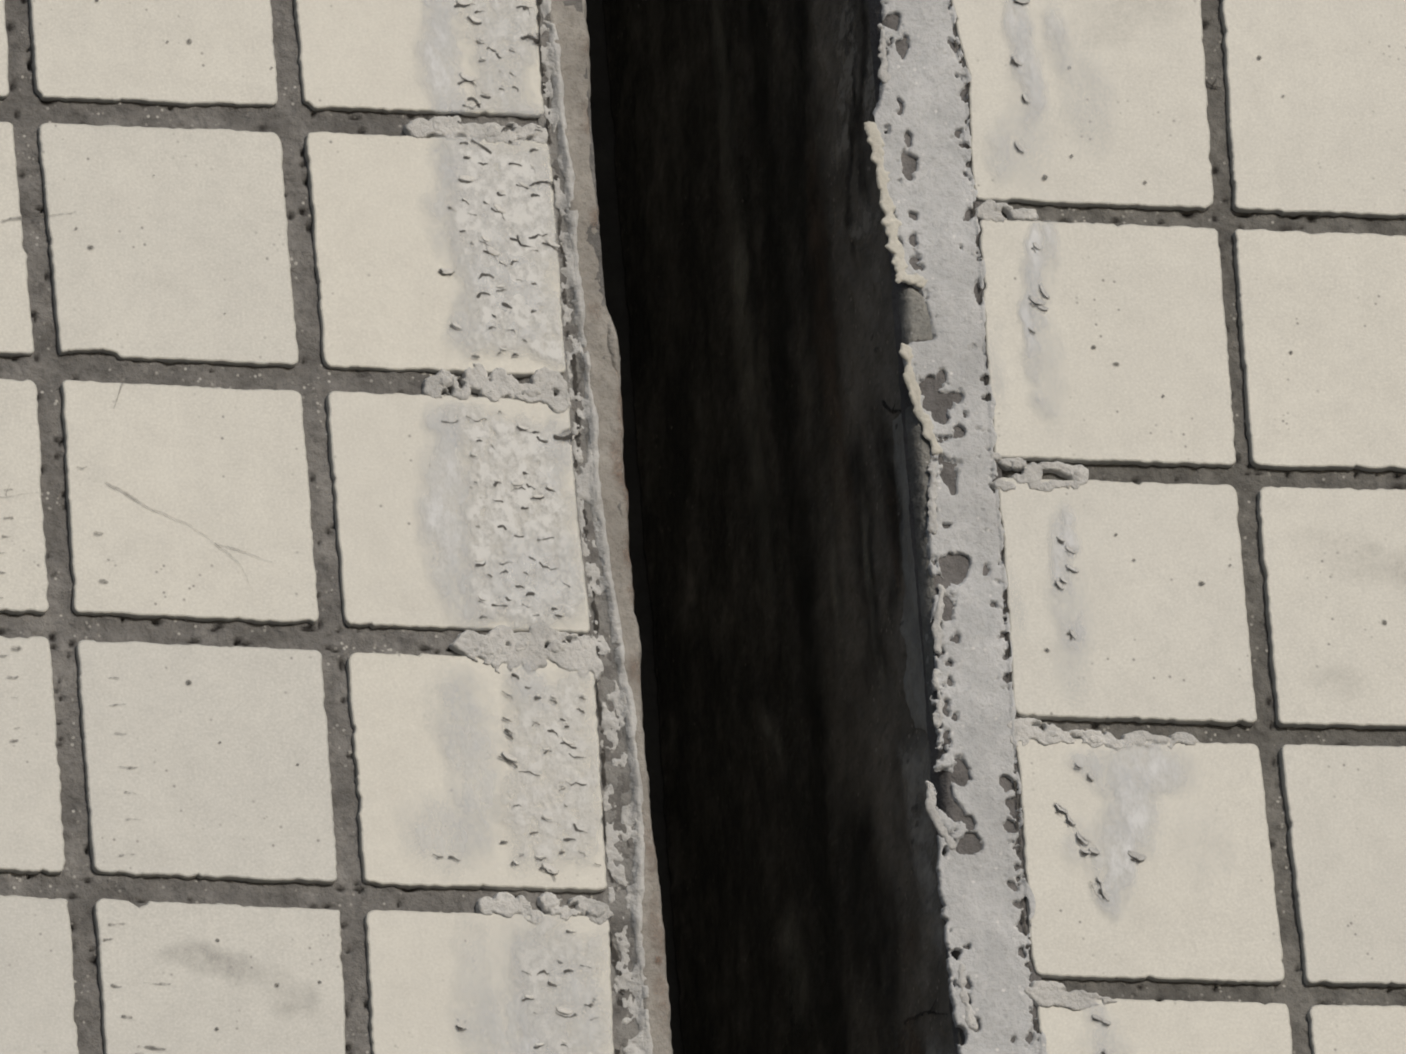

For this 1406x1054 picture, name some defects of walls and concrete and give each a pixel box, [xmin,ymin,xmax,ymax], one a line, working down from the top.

peeling [439,0,653,1054]
crack [521,0,614,882]
crack [610,930,625,1006]
peeling [832,0,1050,1054]
peeling [1054,536,1080,590]